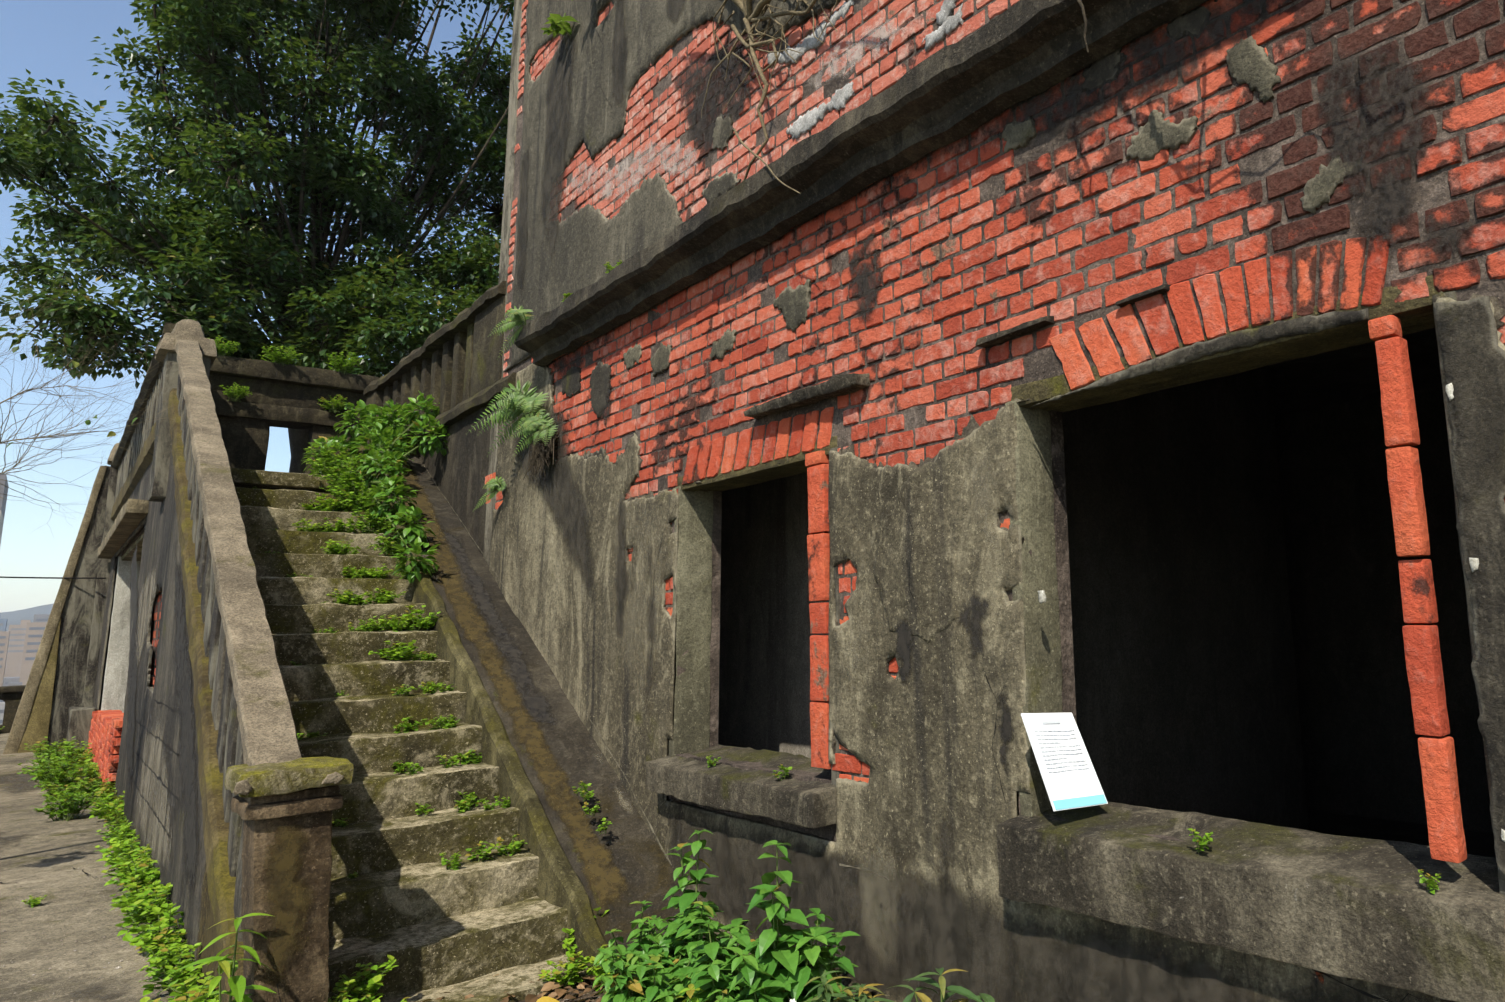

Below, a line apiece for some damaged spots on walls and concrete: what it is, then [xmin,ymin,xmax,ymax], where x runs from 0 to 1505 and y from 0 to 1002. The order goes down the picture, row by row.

spalling [531,0,1505,500]
spalling [838,560,857,624]
leakage [896,612,913,683]
leakage [959,595,989,655]
leakage [999,695,1012,774]
crack [1308,968,1422,1002]